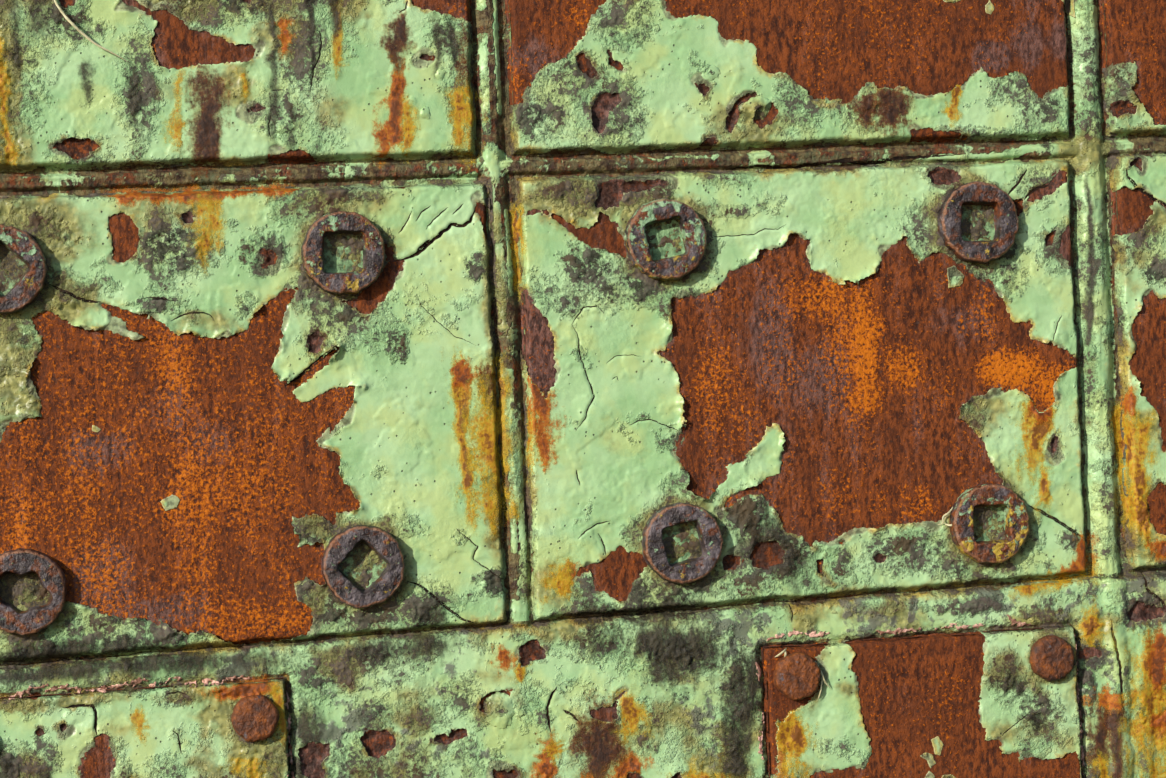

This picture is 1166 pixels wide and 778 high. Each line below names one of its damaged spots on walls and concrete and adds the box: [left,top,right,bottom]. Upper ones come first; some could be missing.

water stain [80,63,92,100]
water stain [127,67,141,122]
rust [372,13,417,168]
peeling [665,0,1075,104]
crack [396,204,476,261]
peeling [0,287,360,645]
rust [450,354,519,547]
rust [527,376,561,472]
crack [572,305,636,430]
peeling [657,233,1078,547]
water stain [580,595,761,777]
peeling [809,622,1102,778]